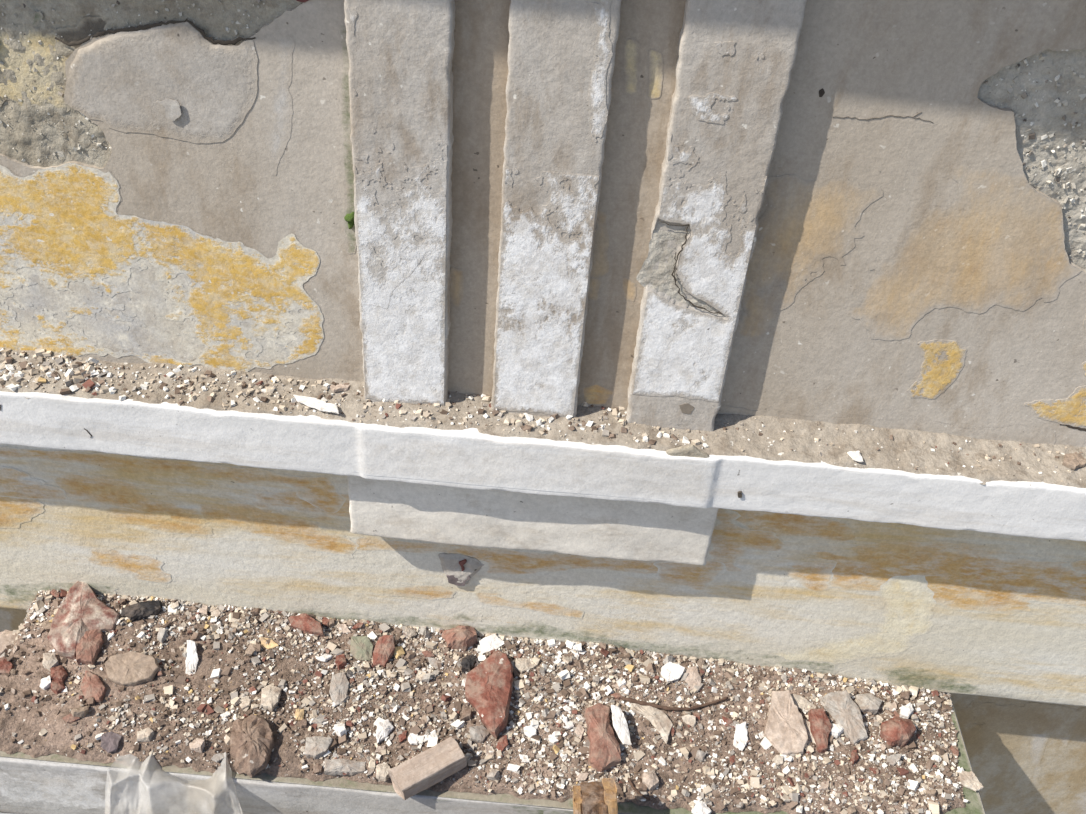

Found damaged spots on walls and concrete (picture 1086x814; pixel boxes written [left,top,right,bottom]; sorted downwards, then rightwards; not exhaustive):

crack [55,19,255,46]
peeling [0,0,325,372]
crack [835,112,933,123]
flaking render [978,49,1086,271]
peeling [632,134,767,414]
peeling [907,339,967,399]
peeling [1024,361,1086,427]
water stain [738,575,937,667]